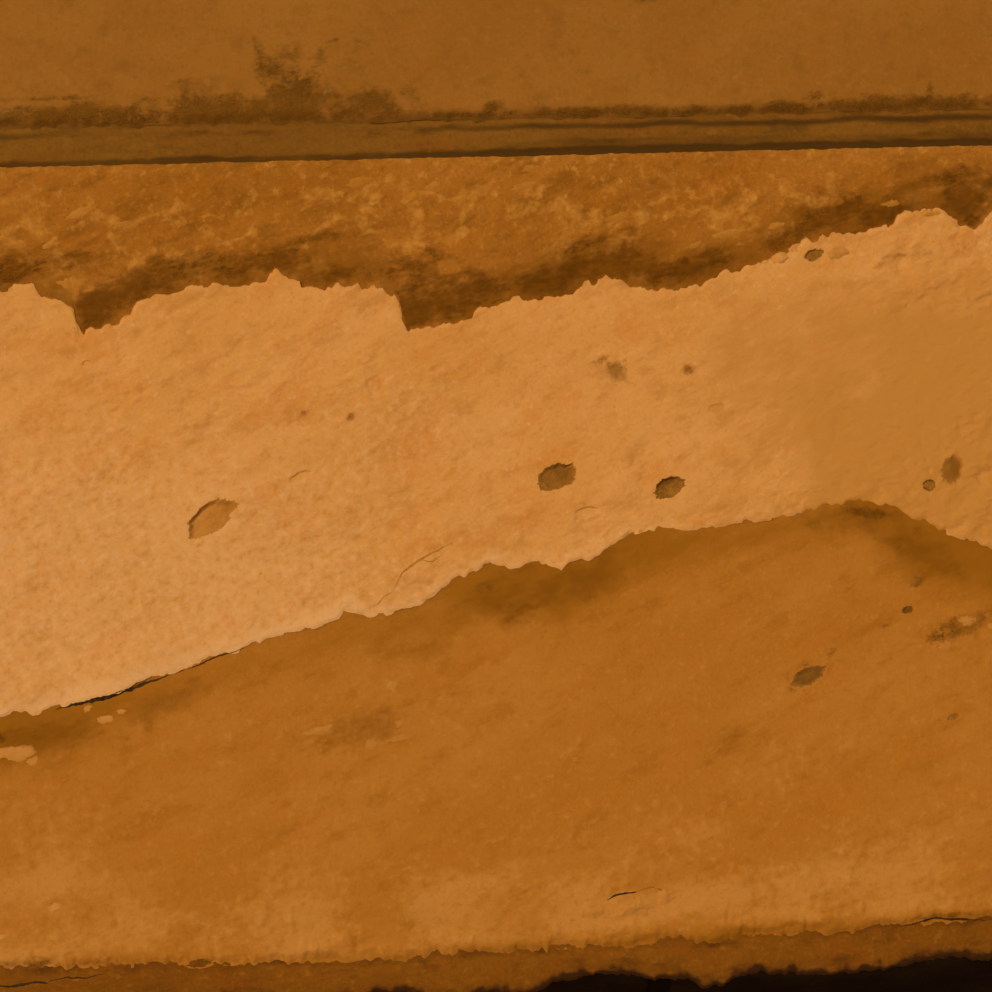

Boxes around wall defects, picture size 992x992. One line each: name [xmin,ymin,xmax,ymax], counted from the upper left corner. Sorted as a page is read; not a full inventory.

leakage [0,72,398,126]
leakage [835,88,973,111]
flaking render [0,200,992,724]
peeling [0,745,38,766]